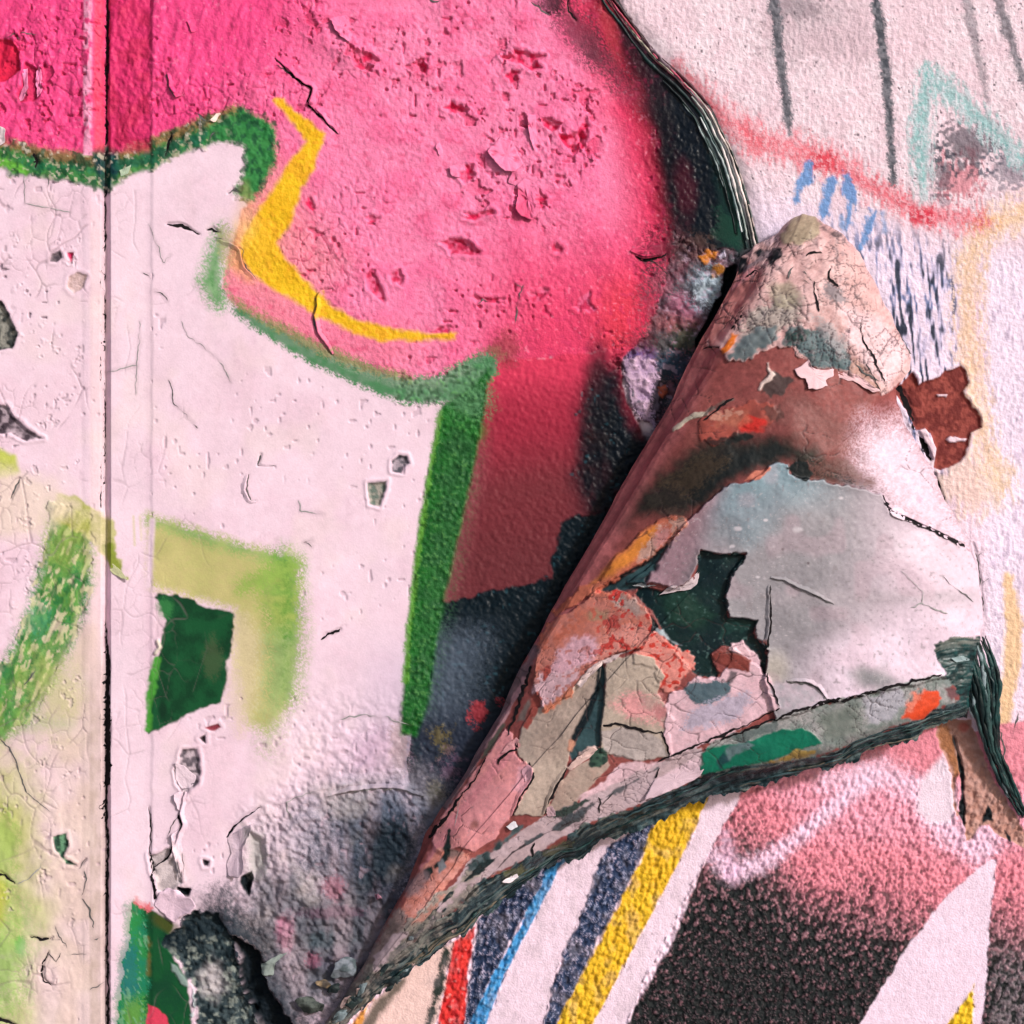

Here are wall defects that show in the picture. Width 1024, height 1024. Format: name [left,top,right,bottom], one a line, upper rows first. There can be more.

crack [275,56,339,134]
crack [24,153,69,212]
peeling [487,137,540,220]
spalling [0,300,20,352]
crack [313,288,334,354]
spalling [0,404,44,441]
peeling [324,214,1024,1024]
crack [0,739,49,811]
peeling [174,723,222,811]
crack [31,622,112,1024]
crack [0,863,42,884]
spalling [149,824,258,1024]